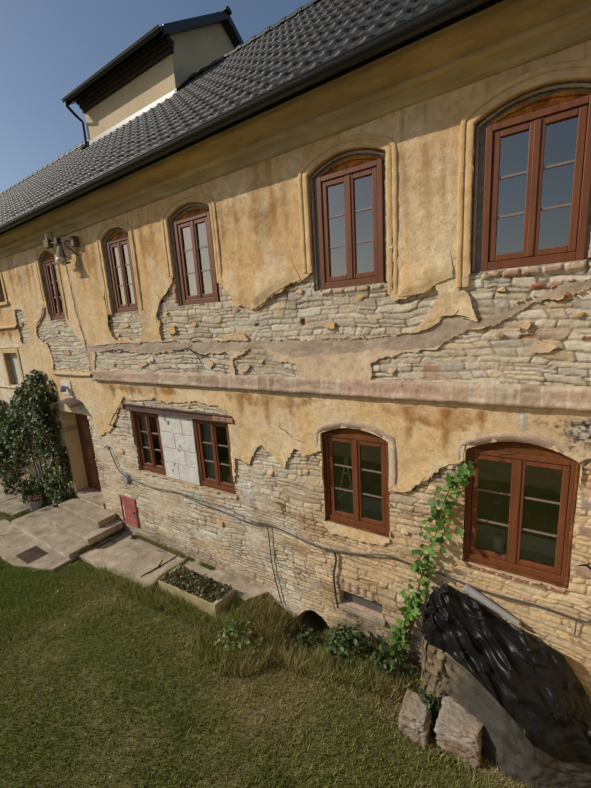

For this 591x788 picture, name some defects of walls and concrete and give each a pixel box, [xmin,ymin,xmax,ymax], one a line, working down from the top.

spalling [16,273,439,377]
spalling [371,260,591,387]
water stain [571,421,591,445]
spalling [89,397,591,702]